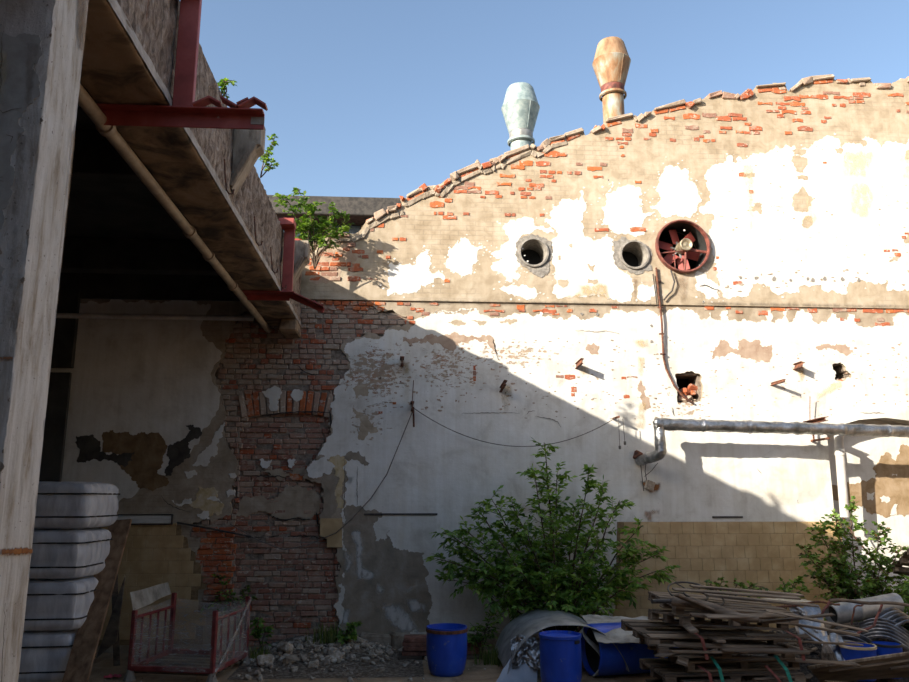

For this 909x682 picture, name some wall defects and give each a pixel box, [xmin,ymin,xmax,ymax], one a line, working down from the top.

peeling [172,88,909,635]
flaking render [102,430,169,491]
crack [244,513,327,544]